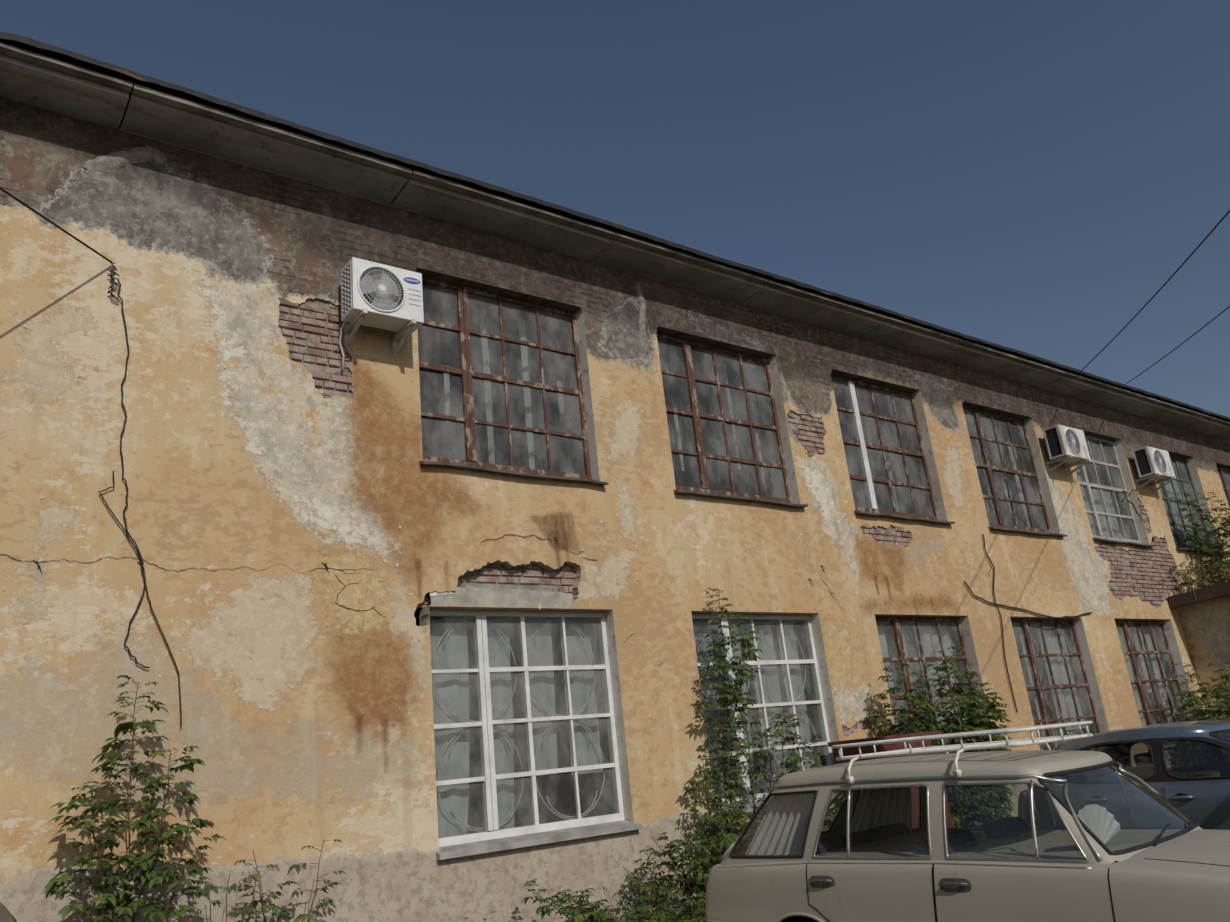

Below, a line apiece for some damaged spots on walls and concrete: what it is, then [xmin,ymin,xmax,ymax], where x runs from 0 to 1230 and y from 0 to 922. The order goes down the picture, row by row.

flaking render [0,97,1230,817]
crack [0,554,385,617]
damp [336,640,413,732]
flaking render [0,810,766,922]